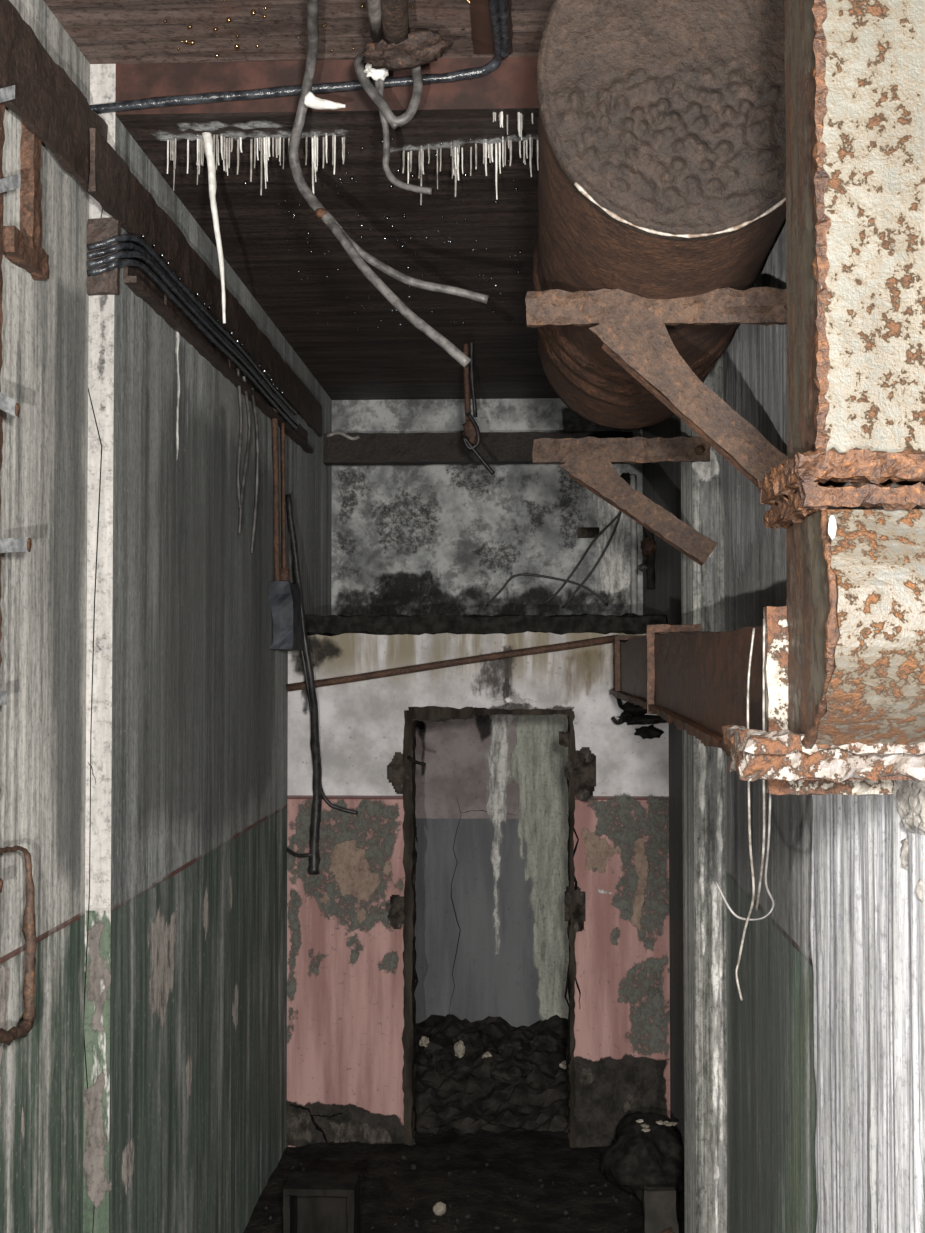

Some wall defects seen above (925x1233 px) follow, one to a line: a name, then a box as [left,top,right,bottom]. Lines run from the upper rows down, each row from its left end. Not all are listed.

leakage [155,122,345,141]
leakage [390,136,539,153]
leakage [337,466,438,553]
leakage [372,571,440,615]
leakage [475,525,520,576]
leakage [523,470,631,605]
leakage [476,646,514,700]
corrosion [610,606,789,756]
corrosion [765,780,894,796]
peeling [287,752,412,1043]
leakage [485,714,569,1021]
peeling [413,698,670,1148]